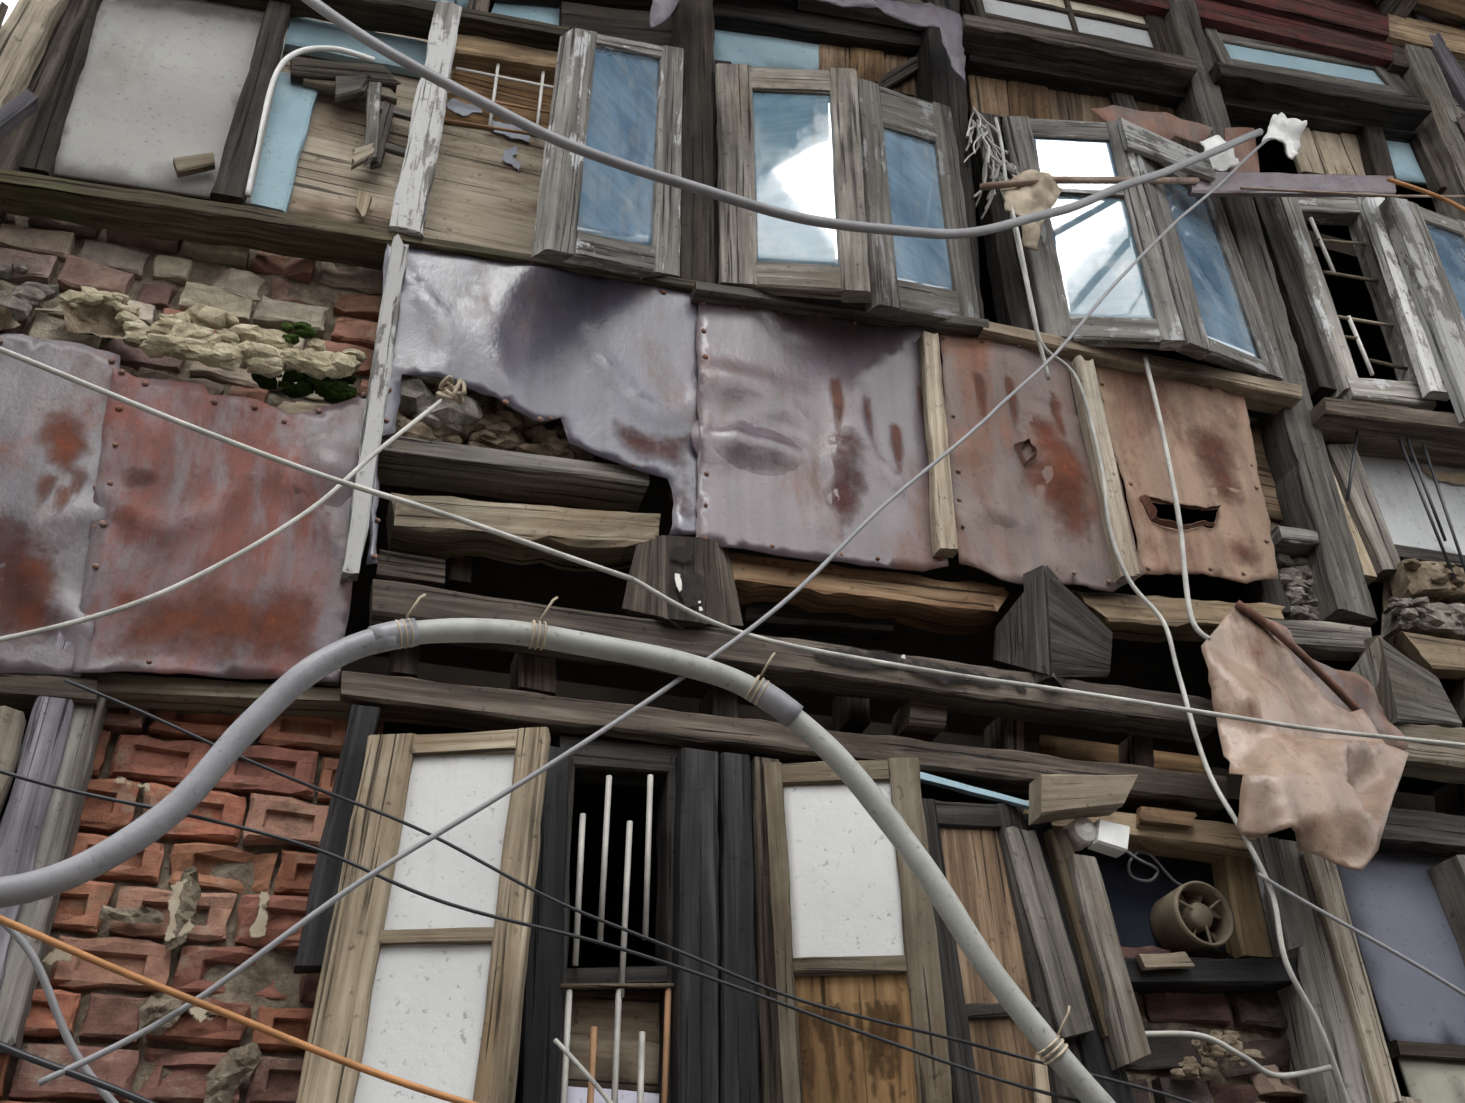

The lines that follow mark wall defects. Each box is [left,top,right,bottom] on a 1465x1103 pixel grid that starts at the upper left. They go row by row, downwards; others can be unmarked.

spalling [0,262,366,380]
rust [39,418,87,506]
rust [831,379,862,513]
rust [892,424,902,461]
rust [975,374,986,413]
rust [1007,377,1089,531]
rust [1200,434,1237,495]
rust [0,520,50,633]